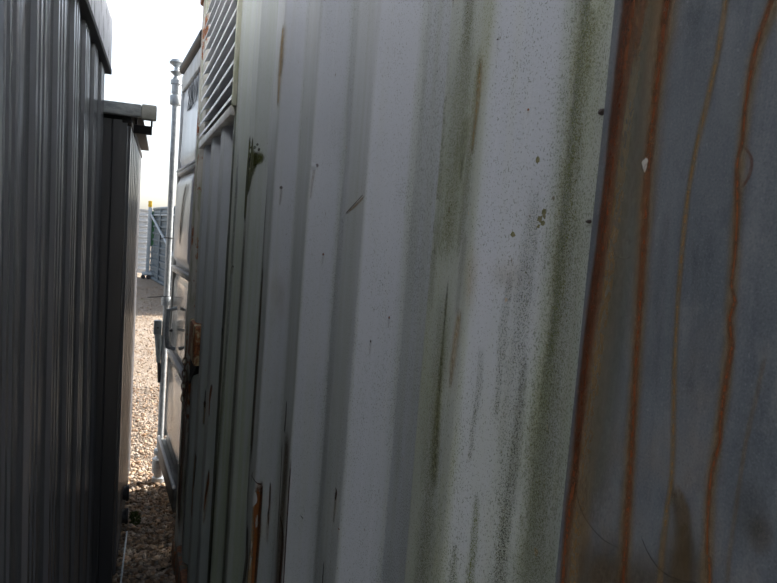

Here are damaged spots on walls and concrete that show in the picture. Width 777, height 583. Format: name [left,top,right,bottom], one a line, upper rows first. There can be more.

corrosion [246,402,291,583]
corrosion [561,0,675,583]
corrosion [702,0,777,583]